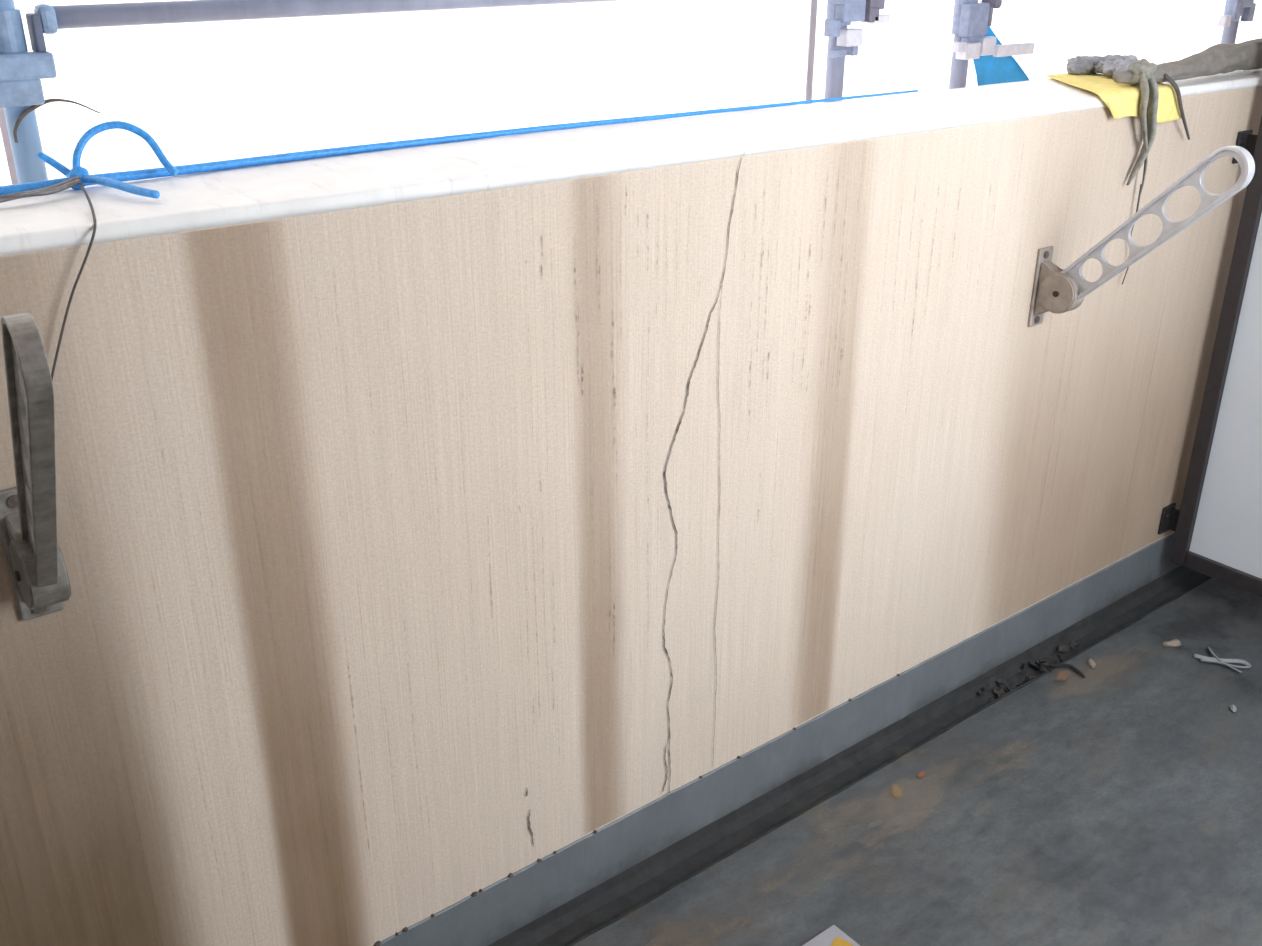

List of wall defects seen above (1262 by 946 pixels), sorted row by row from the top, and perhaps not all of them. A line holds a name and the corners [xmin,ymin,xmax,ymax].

crack [663,158,742,791]